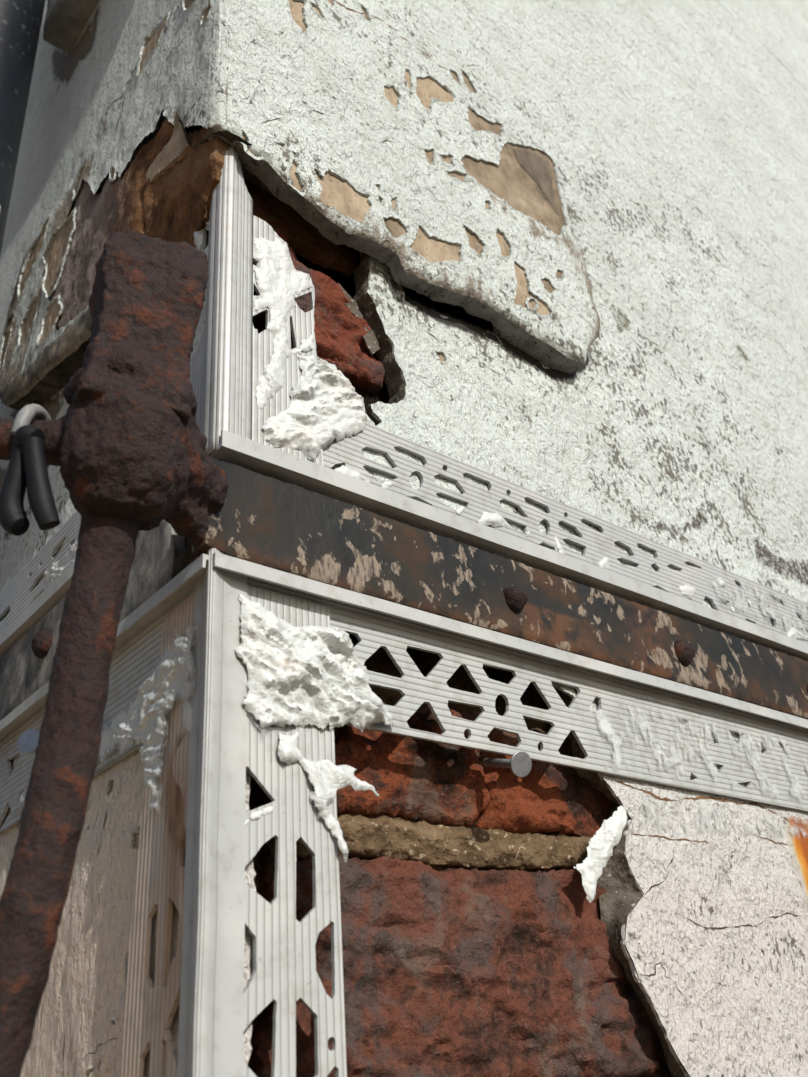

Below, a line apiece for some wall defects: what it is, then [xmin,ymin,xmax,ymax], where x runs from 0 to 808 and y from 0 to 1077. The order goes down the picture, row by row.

peeling [381,68,568,237]
spalling [0,118,584,426]
spalling [554,687,572,707]
crack [616,781,793,846]
crack [635,834,710,895]
rust [789,819,808,896]
spalling [567,731,690,1077]
crack [675,912,800,944]
crack [640,962,688,1007]